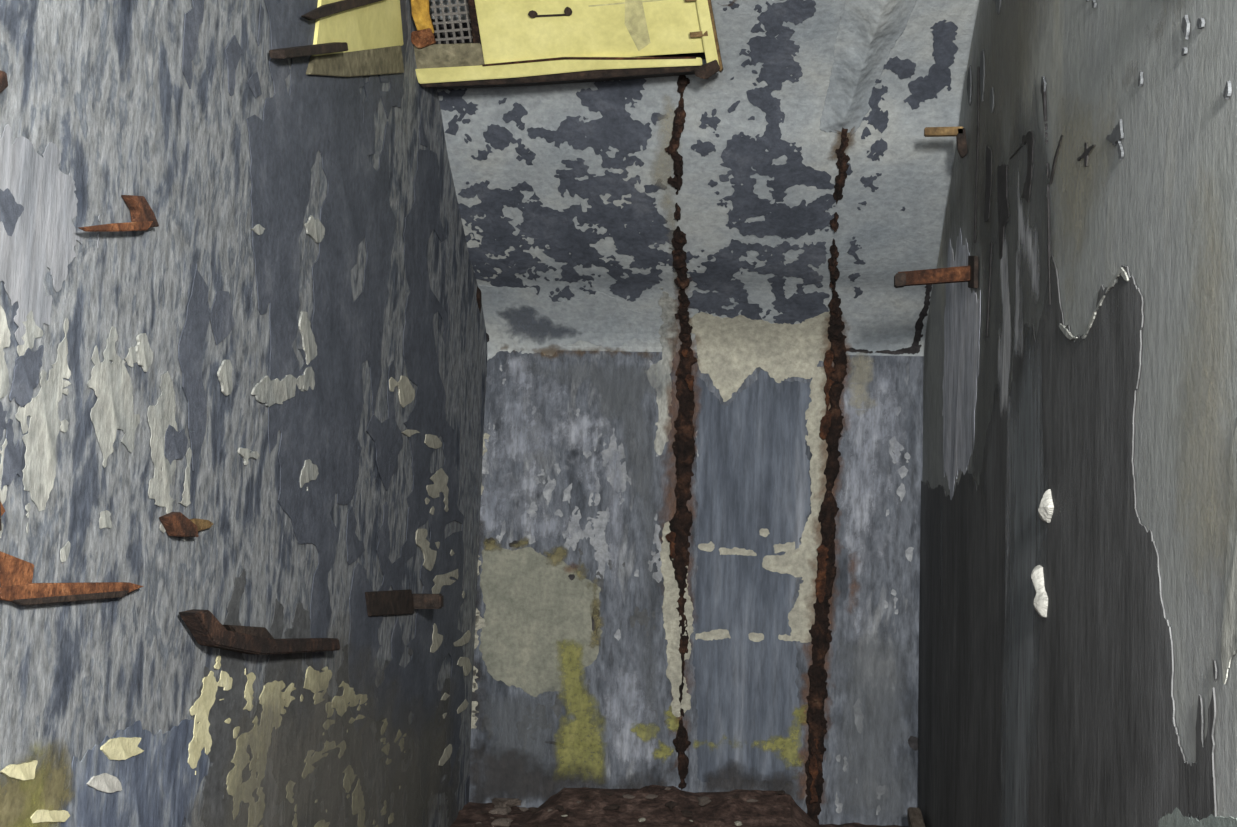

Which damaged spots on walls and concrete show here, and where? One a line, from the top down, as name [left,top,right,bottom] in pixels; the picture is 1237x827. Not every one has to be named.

peeling [846,20,958,210]
peeling [0,124,101,533]
peeling [30,0,631,827]
peeling [438,0,836,784]
peeling [847,236,865,298]
crack [846,284,932,355]
corrosion [894,256,978,288]
peeling [905,256,1237,827]
peeling [0,760,38,780]
damp [0,747,72,827]
damp [228,689,445,827]
damp [469,640,680,803]